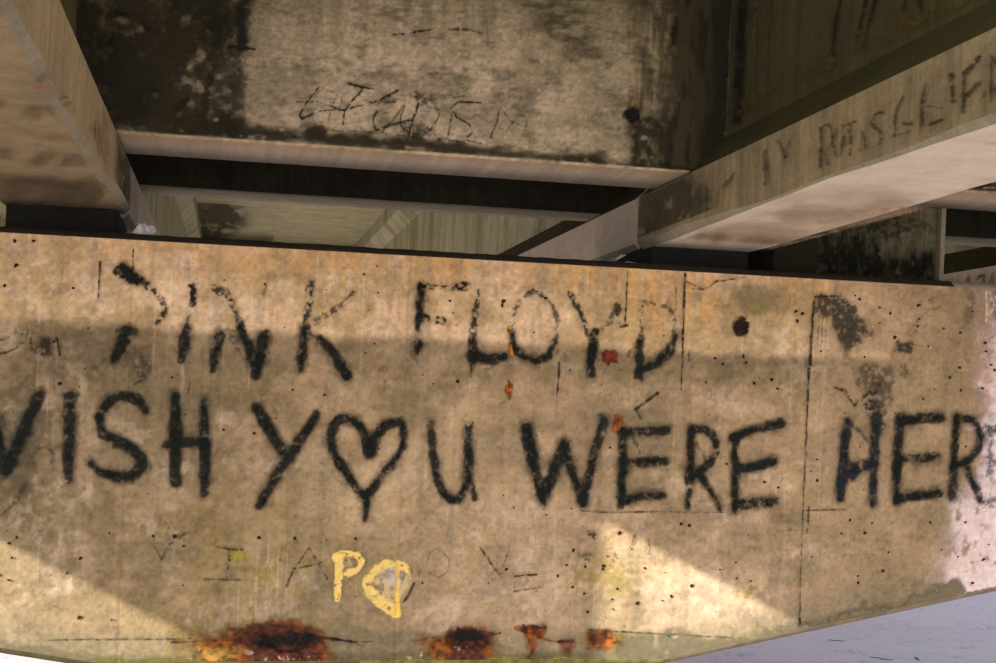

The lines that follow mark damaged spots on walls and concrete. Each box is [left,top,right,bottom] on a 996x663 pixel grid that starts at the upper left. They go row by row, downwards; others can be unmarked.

water stain [76,0,255,202]
water stain [902,579,966,606]
corrosion [171,619,352,661]
corrosion [406,626,501,660]
corrosion [514,625,622,659]